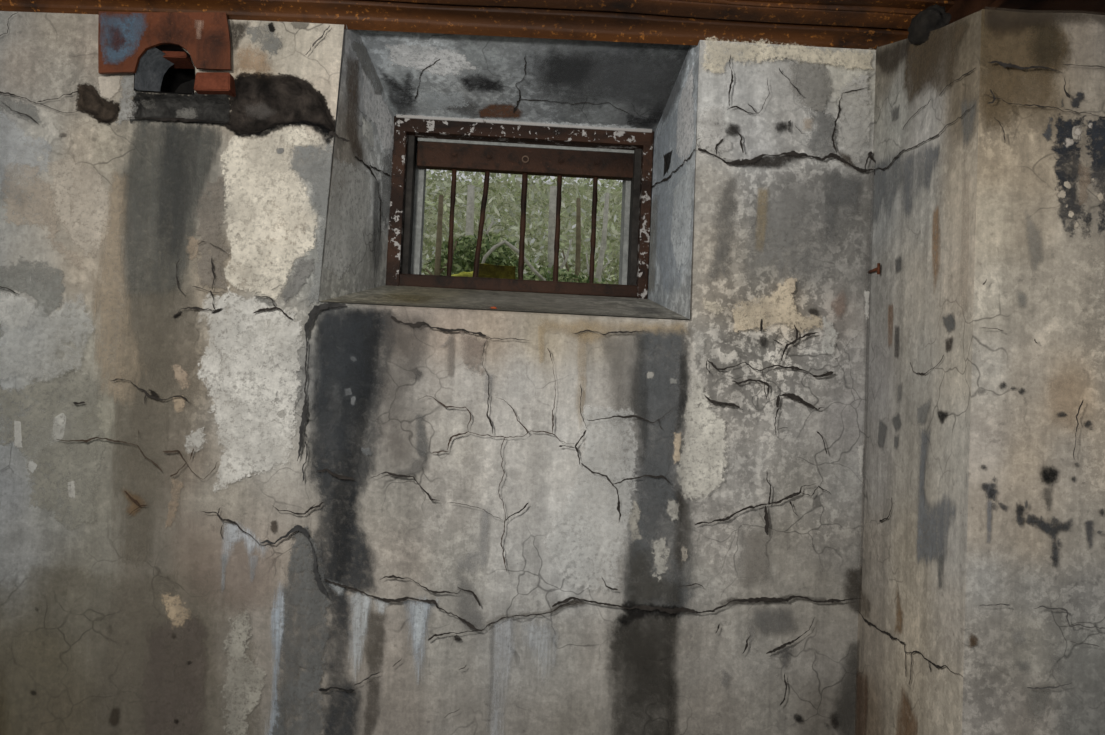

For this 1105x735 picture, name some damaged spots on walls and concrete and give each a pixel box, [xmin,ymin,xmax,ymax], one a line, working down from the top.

crack [0,91,80,123]
spalling [76,72,335,137]
crack [651,56,1105,187]
crack [172,241,224,318]
water stain [117,119,220,560]
crack [57,430,216,479]
water stain [310,308,423,735]
water stain [398,416,428,474]
crack [202,296,962,705]
water stain [610,332,692,735]
water stain [981,465,1072,566]
water stain [1085,509,1104,547]